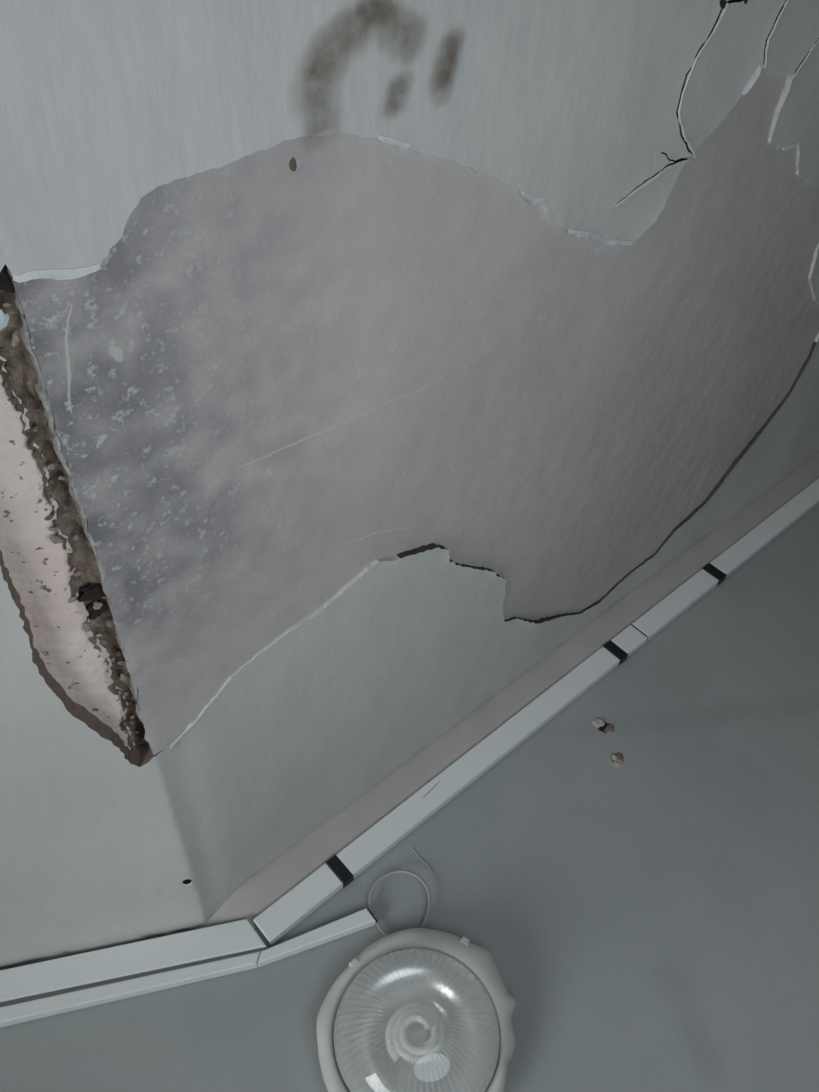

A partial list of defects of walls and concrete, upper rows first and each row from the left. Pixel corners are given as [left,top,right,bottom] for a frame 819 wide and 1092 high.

crack [615,0,748,207]
crack [764,0,789,69]
peeling [0,66,819,755]